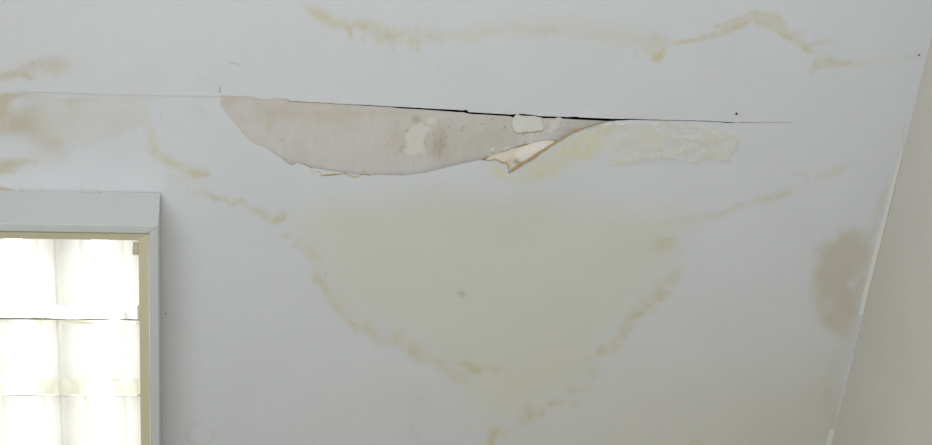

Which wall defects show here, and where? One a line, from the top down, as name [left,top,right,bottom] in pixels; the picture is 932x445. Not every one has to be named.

water stain [296,0,924,77]
peeling [220,96,608,178]
crack [288,100,647,121]
water stain [486,122,615,187]
crack [671,117,789,125]
water stain [0,51,521,393]
water stain [481,159,856,445]
water stain [804,221,878,341]